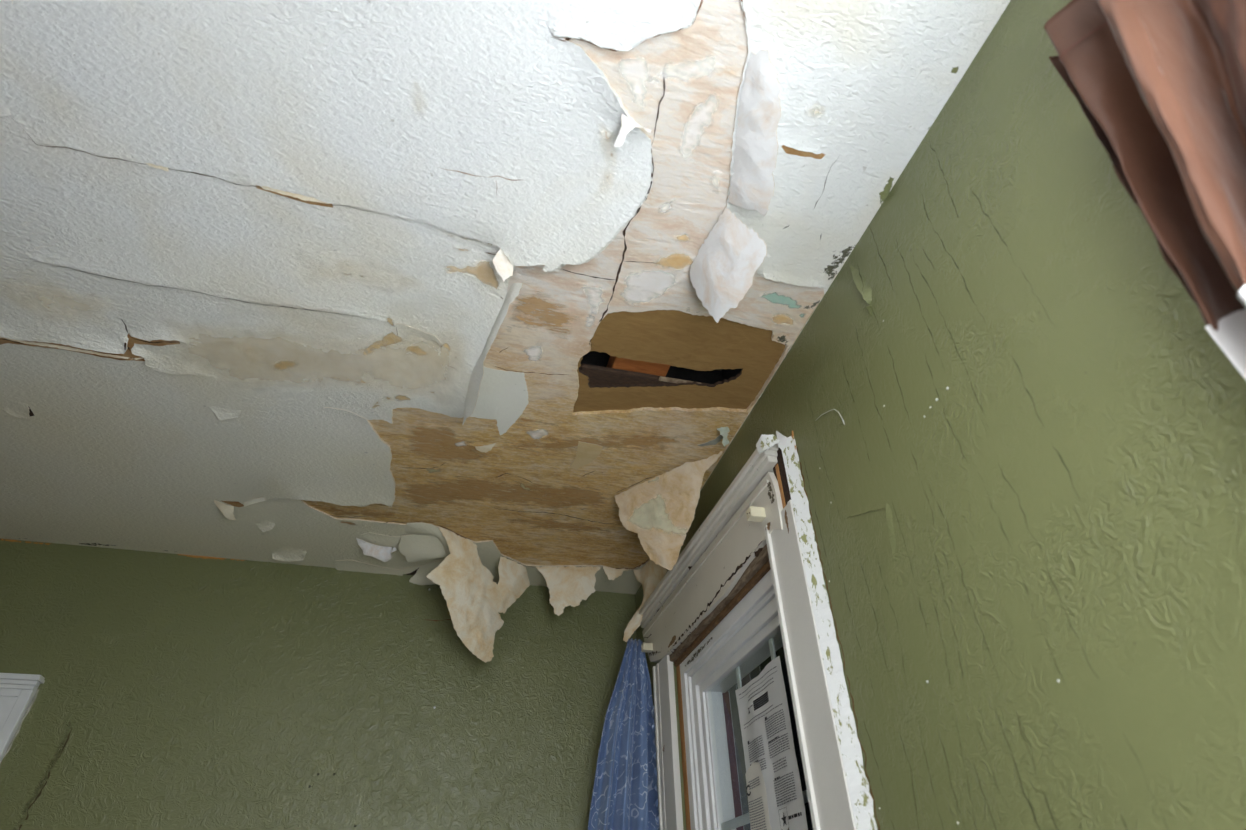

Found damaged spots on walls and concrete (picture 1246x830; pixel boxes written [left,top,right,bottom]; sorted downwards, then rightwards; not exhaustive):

crack [0,117,262,188]
crack [121,319,175,351]
peeling [0,0,825,585]
crack [442,168,526,194]
crack [563,68,665,344]
spalling [649,522,770,655]
spalling [766,436,877,830]
crack [797,149,1099,830]